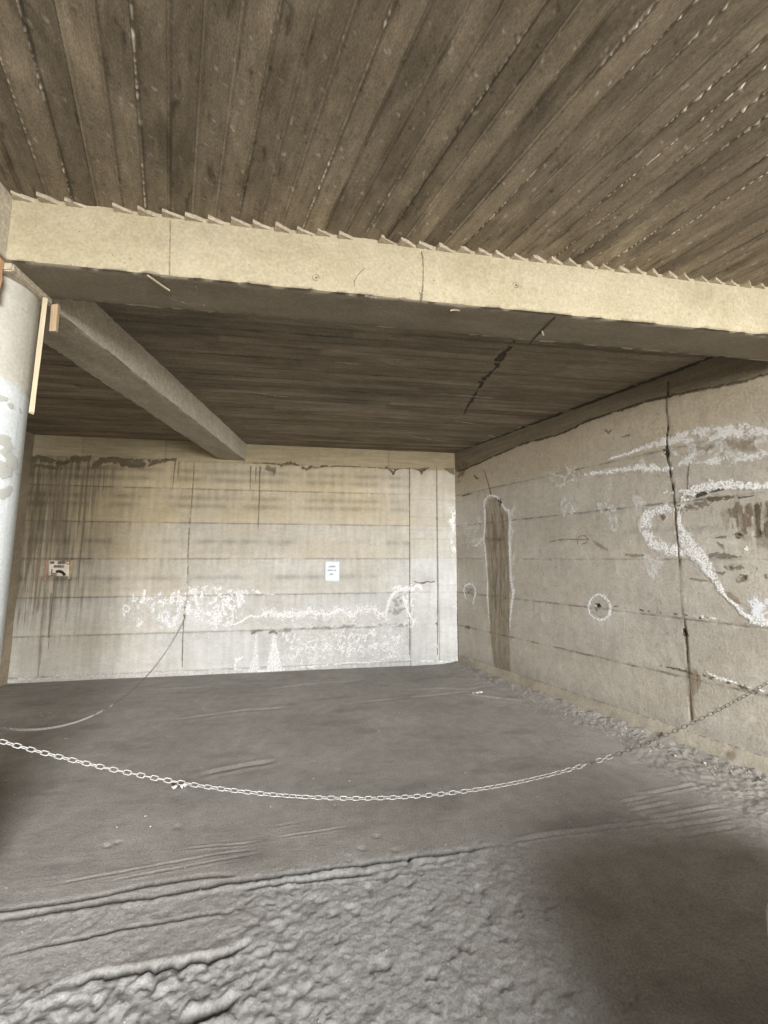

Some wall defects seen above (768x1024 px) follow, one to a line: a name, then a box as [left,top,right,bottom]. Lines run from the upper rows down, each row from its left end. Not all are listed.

crack [463,317,556,414]
leakage [549,423,768,516]
crack [663,381,690,562]
leakage [22,455,176,653]
leakage [46,583,454,680]
leakage [447,493,516,671]
crack [682,619,690,667]
leakage [632,479,768,627]